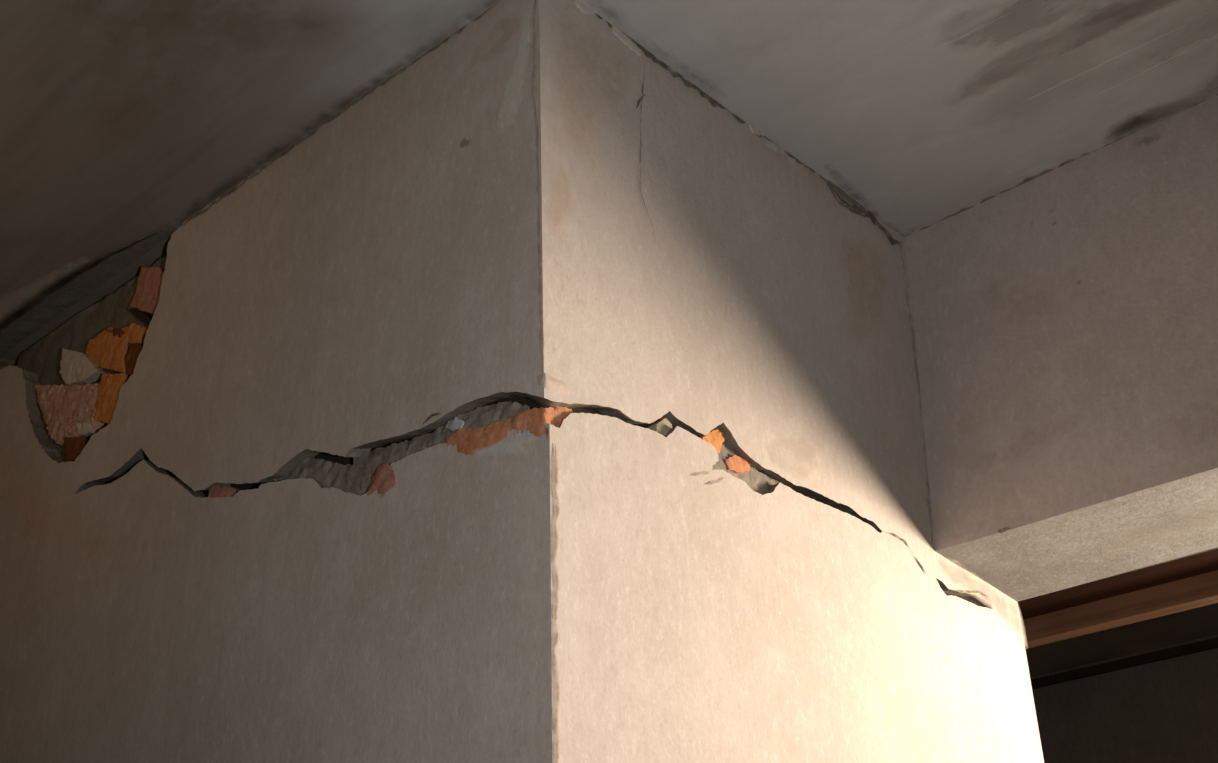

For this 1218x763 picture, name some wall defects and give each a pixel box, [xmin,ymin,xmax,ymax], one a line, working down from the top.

crack [0,0,501,369]
crack [576,0,1218,259]
water stain [957,0,1176,96]
water stain [0,259,86,320]
flaking render [17,255,167,462]
crack [148,0,603,763]
crack [632,417,798,495]
crack [883,458,1025,642]